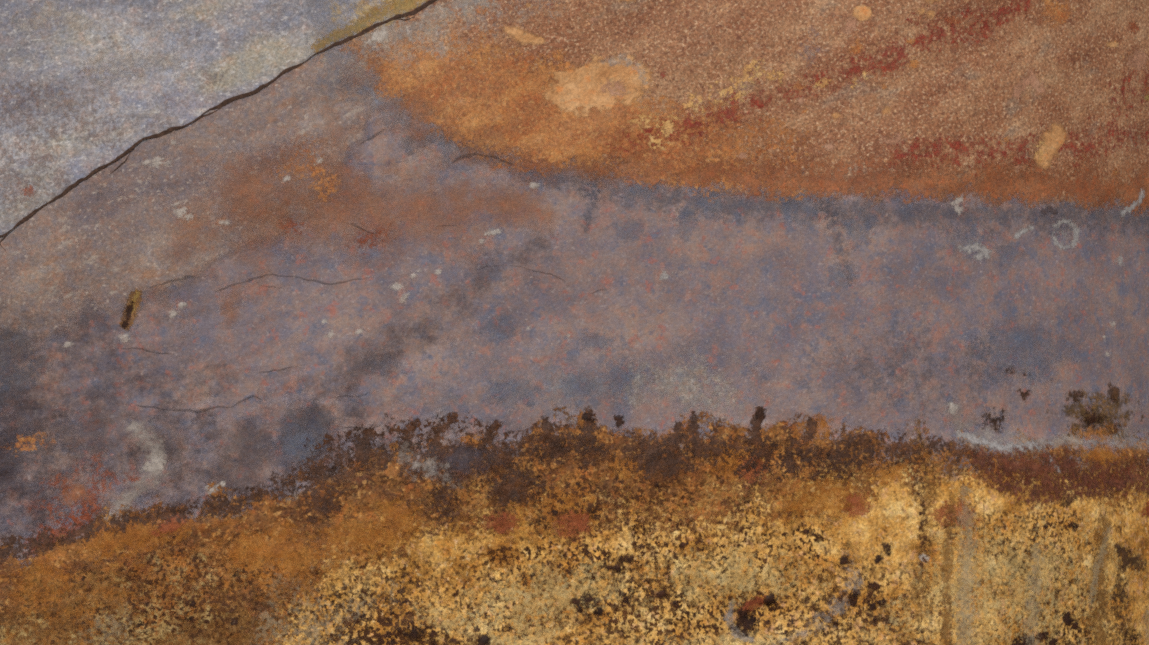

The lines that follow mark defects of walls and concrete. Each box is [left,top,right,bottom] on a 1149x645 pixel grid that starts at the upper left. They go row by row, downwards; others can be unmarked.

crack [0,0,437,250]
rust [0,406,1149,645]